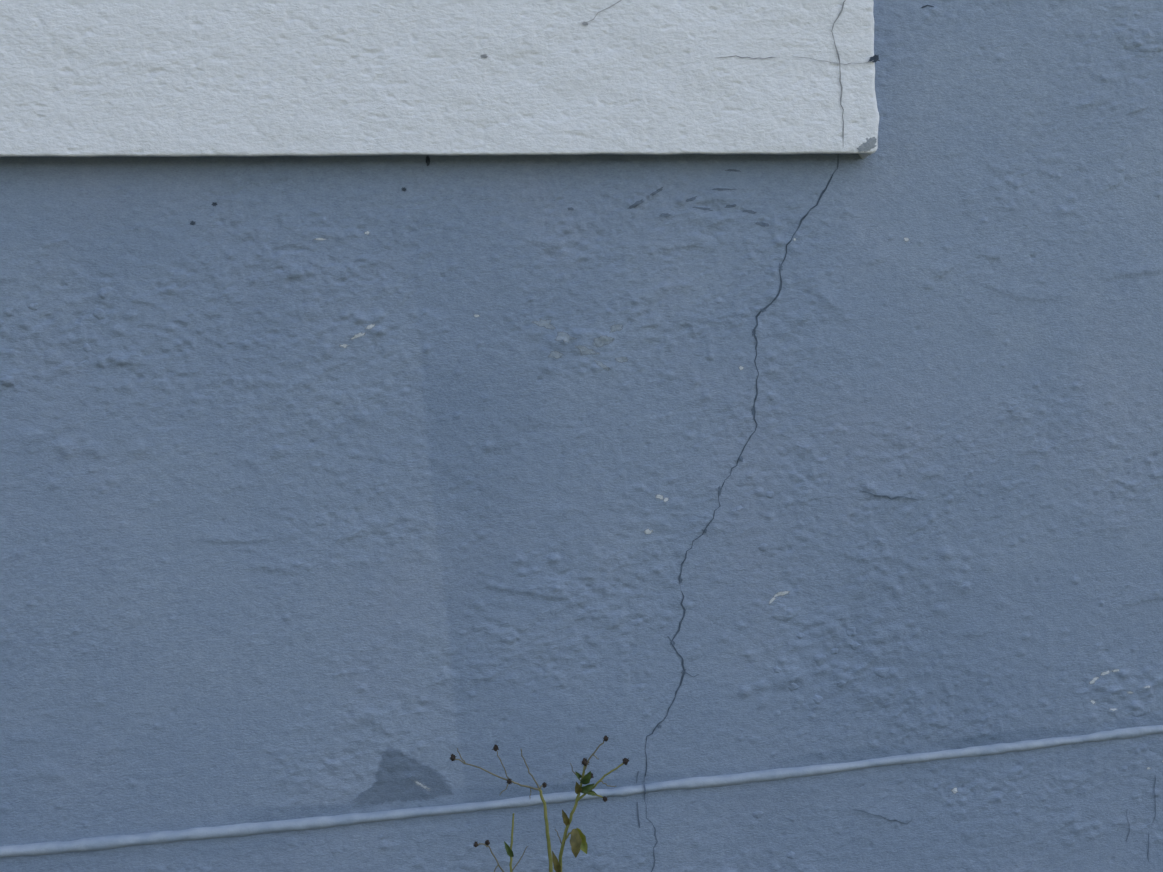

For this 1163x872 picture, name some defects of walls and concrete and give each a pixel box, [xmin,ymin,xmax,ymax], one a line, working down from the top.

crack [636,0,874,872]
crack [850,809,913,824]